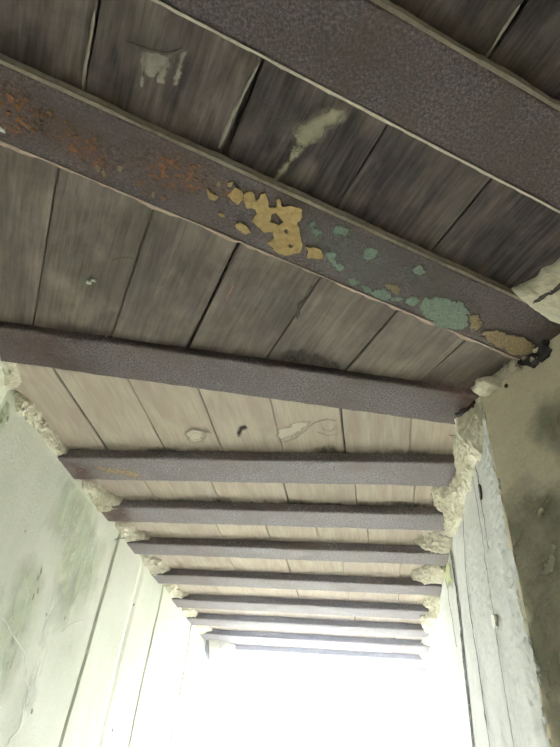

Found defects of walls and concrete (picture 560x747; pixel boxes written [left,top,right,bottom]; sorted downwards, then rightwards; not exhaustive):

leakage [140,51,187,87]
corrosion [0,82,230,200]
leakage [273,109,344,181]
peeling [207,181,552,373]
crack [533,283,560,304]